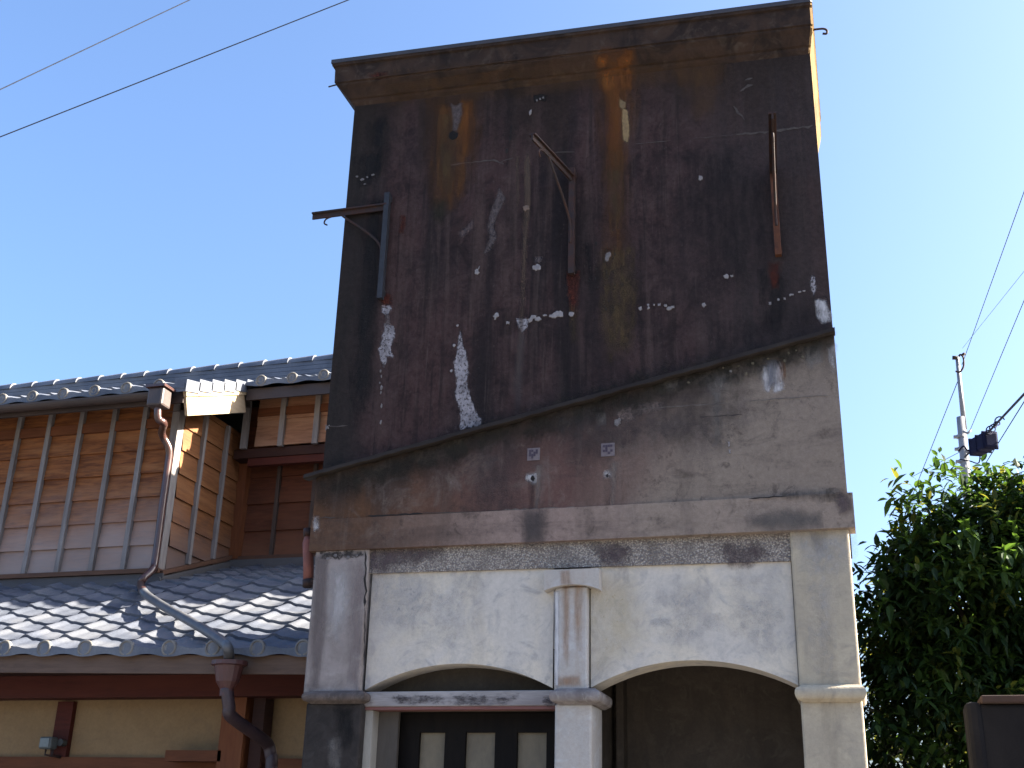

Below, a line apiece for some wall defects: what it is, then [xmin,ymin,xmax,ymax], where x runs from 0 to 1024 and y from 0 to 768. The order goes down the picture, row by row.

peeling [619,98,630,142]
peeling [493,311,575,333]
peeling [769,275,830,322]
peeling [378,305,395,425]
peeling [450,324,482,430]
damp [525,513,542,541]
damp [724,544,764,567]
crack [361,553,369,658]